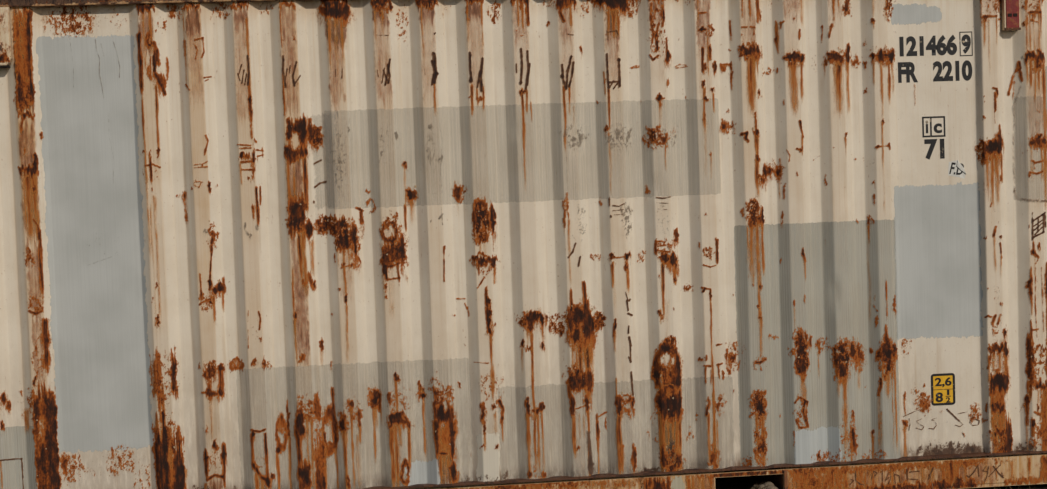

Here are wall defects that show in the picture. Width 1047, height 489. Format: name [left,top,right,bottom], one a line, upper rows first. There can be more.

rust [371,0,451,48]
rust [468,84,485,115]
rust [519,88,532,180]
rust [124,0,376,363]
rust [543,0,895,370]
rust [379,185,419,299]
rust [198,311,272,403]
rust [452,182,505,450]
rust [203,417,227,489]